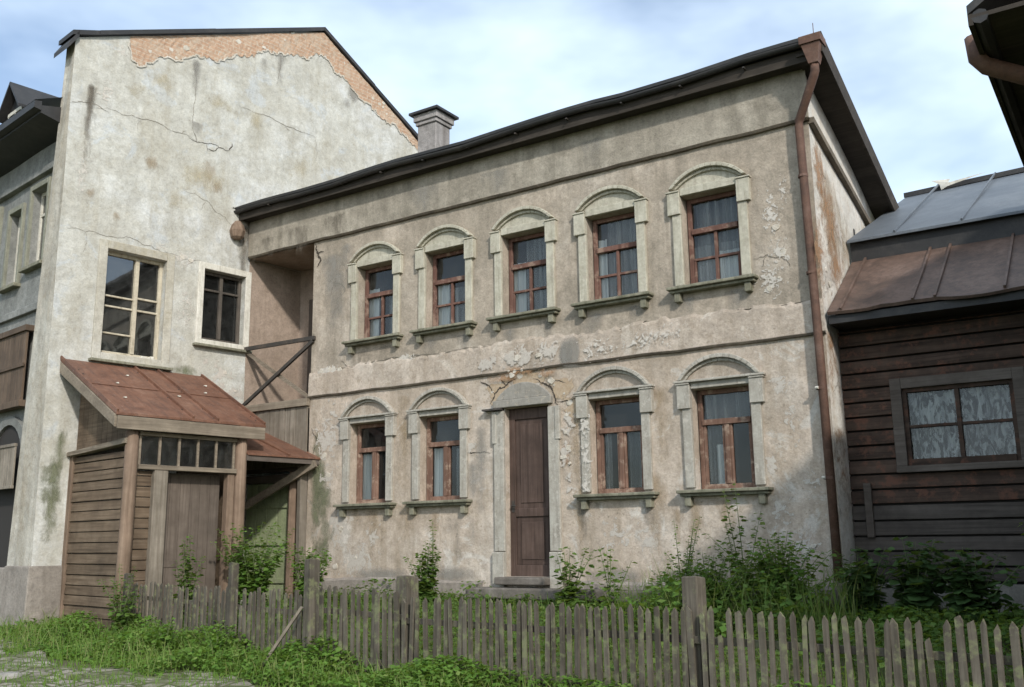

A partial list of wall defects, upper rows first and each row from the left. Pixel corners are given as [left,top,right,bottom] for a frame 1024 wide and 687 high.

damp [86,85,94,130]
crack [72,78,233,151]
flaking render [128,32,418,150]
peeling [754,179,790,300]
peeling [582,322,684,361]
crack [480,379,576,405]
flaking render [467,337,592,492]
damp [43,433,63,528]